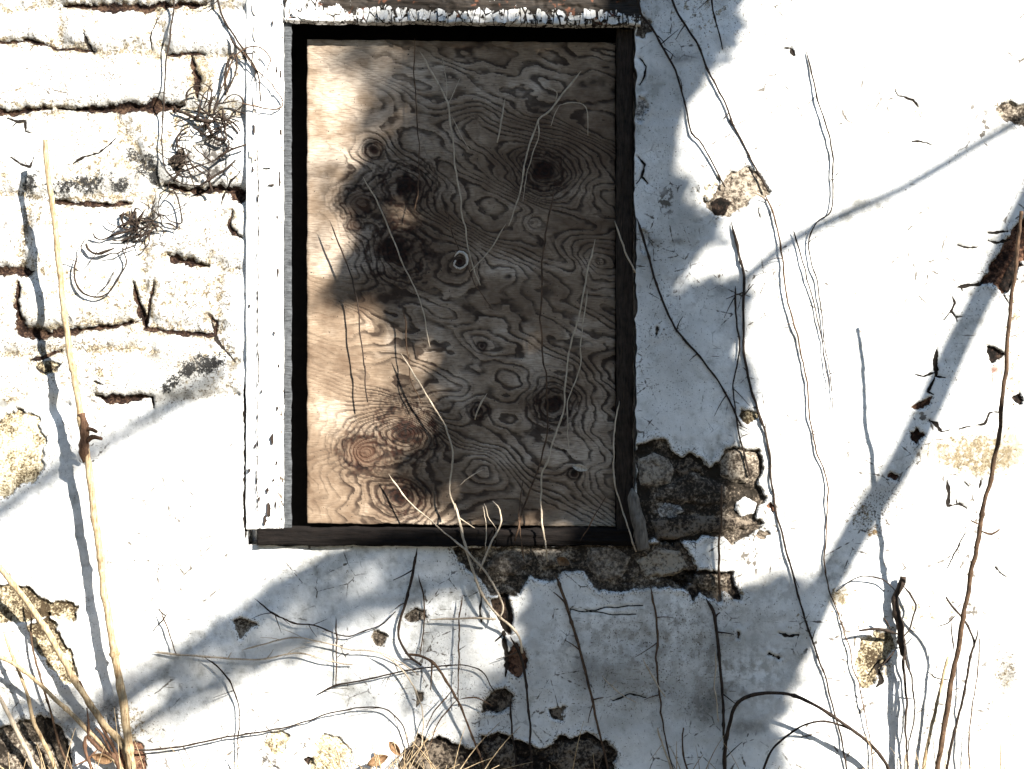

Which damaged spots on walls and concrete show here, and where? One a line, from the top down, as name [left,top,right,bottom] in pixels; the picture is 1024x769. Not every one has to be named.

peeling [292,6,308,20]
peeling [410,8,446,21]
peeling [495,9,520,23]
peeling [568,9,618,24]
flaking render [168,137,227,183]
flaking render [703,167,770,217]
flaking render [981,218,1024,294]
flaking render [35,361,60,376]
flaking render [0,408,47,498]
flaking render [453,439,774,678]
flaking render [0,584,79,684]
flaking render [398,732,617,769]